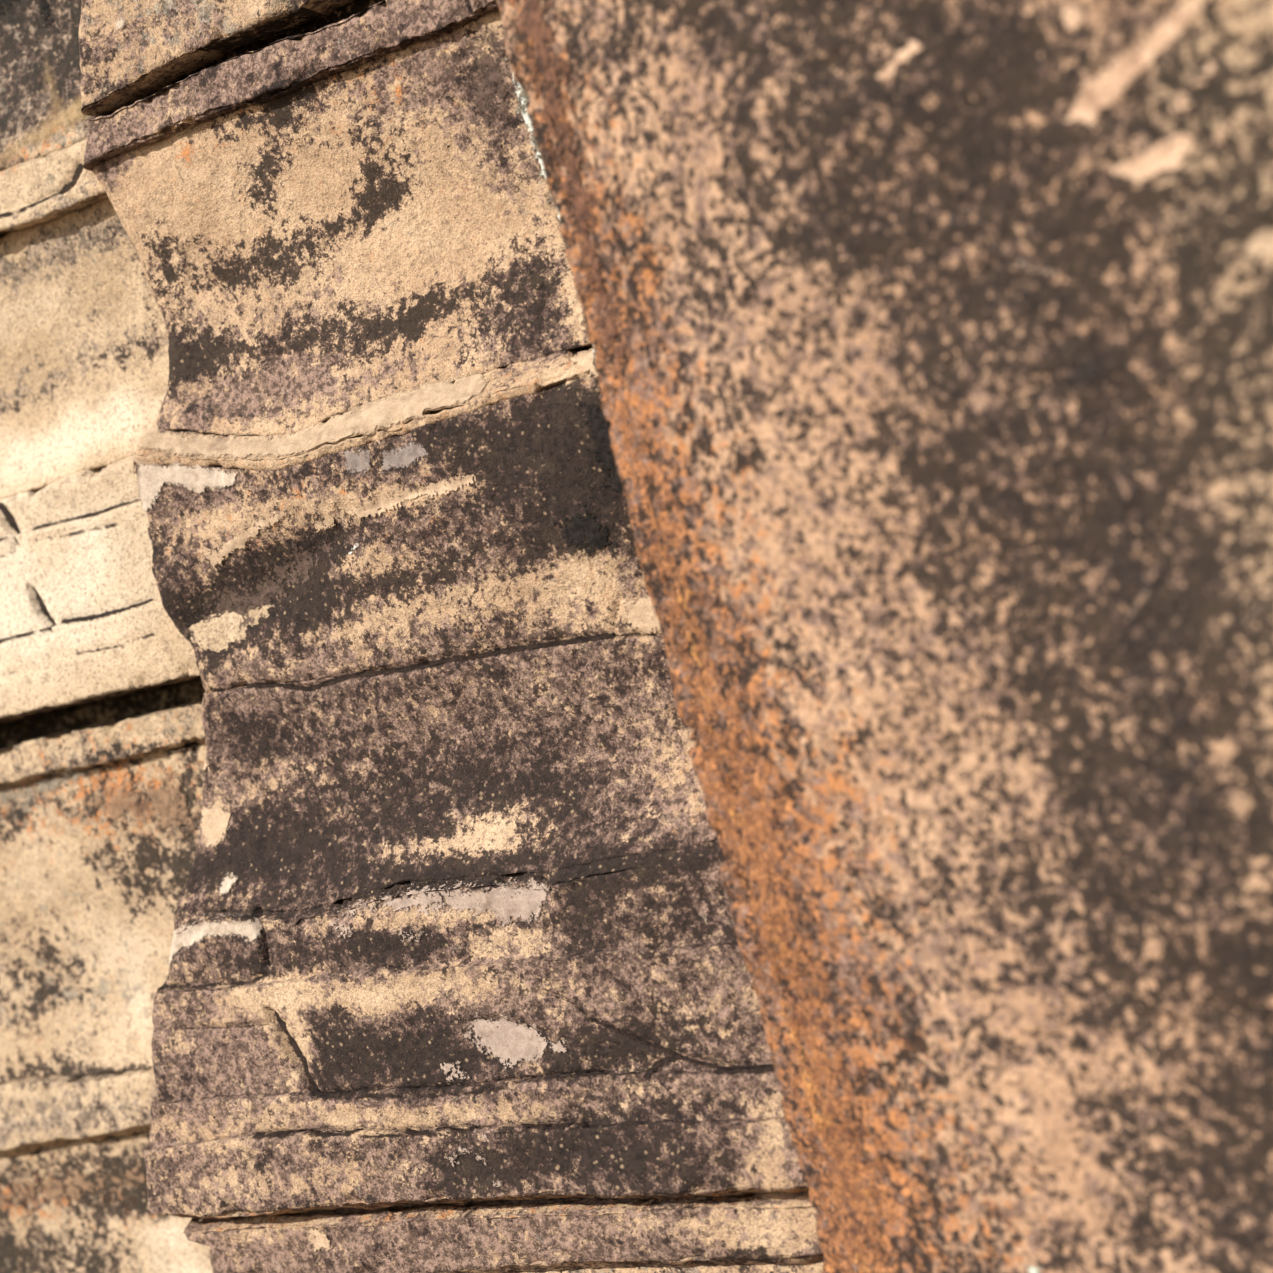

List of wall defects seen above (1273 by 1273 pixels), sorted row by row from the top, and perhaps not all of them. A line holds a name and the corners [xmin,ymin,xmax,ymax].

water stain [161,384,307,424]
spalling [133,373,488,513]
water stain [579,400,624,499]
crack [0,499,140,557]
water stain [553,503,623,566]
crack [0,599,153,655]
corrosion [501,0,911,1273]
spalling [168,914,262,964]
spalling [330,877,549,938]
crack [186,1011,607,1139]
spalling [464,1012,566,1076]
crack [543,992,775,1080]